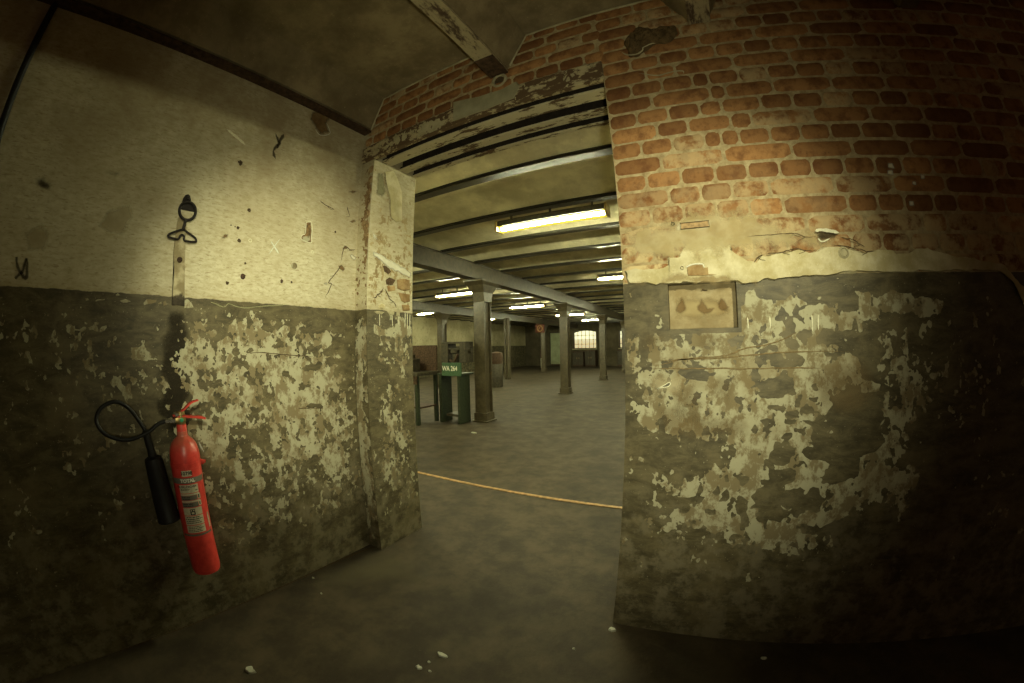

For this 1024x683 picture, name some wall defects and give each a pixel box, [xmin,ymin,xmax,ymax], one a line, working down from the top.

peeling [375,116,452,152]
crack [749,233,873,262]
spalling [816,228,839,242]
flaking render [667,263,729,283]
peeling [43,167,418,553]
crack [653,330,840,370]
peeling [627,289,1001,567]